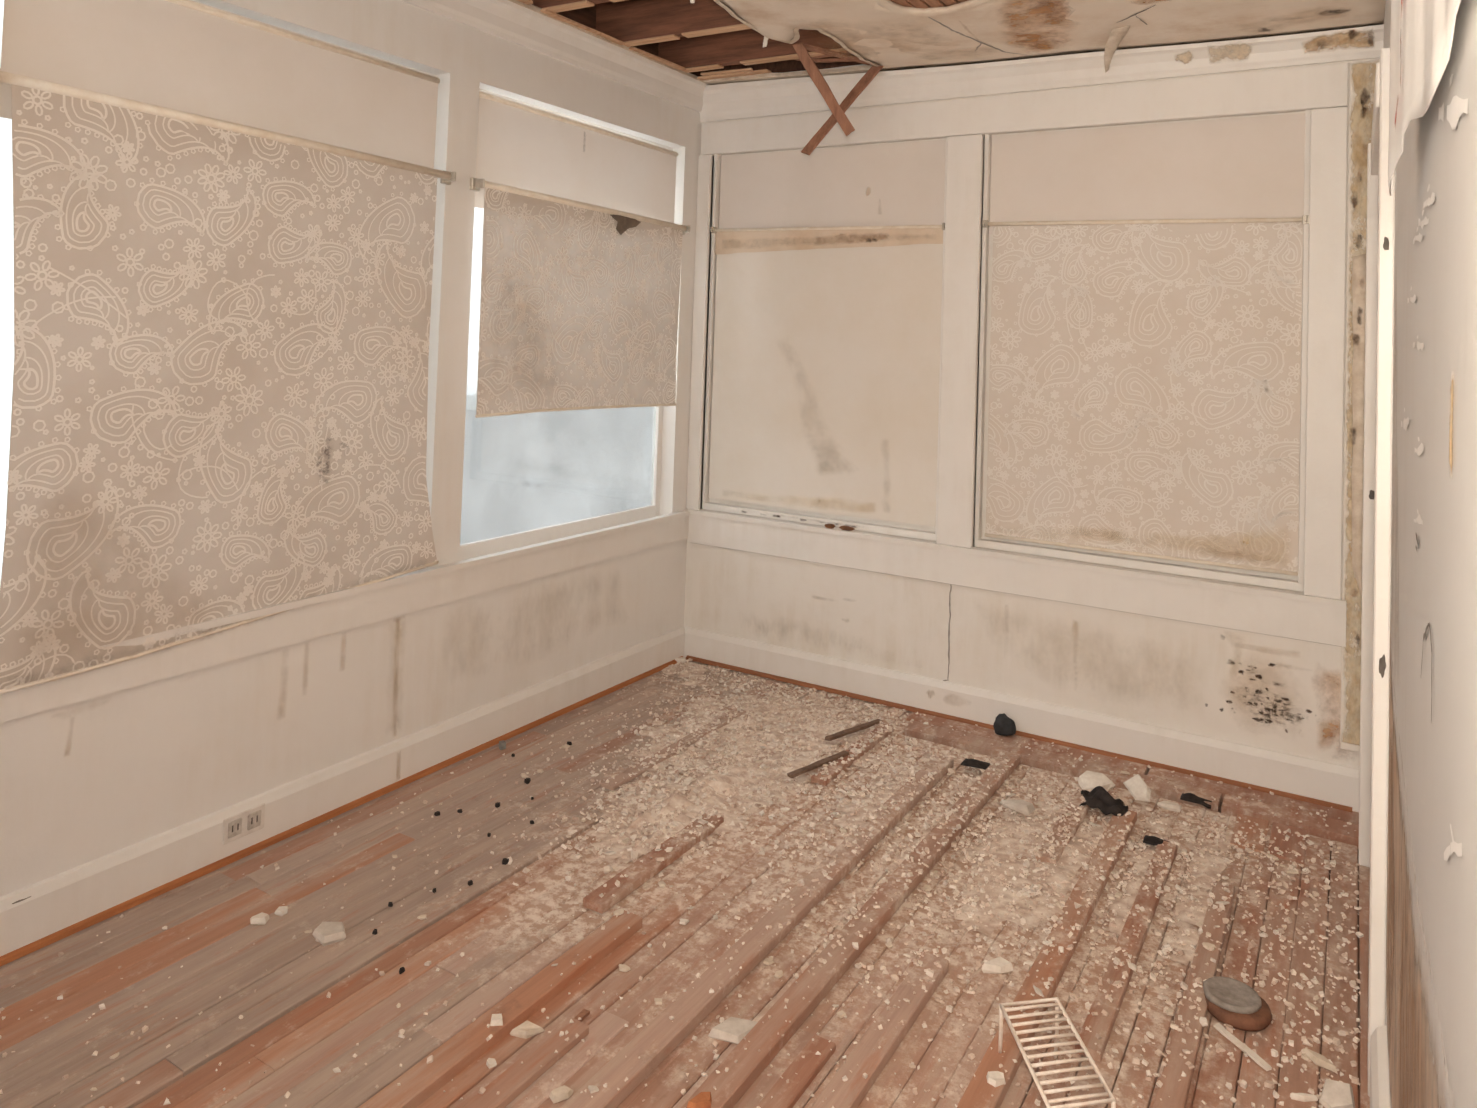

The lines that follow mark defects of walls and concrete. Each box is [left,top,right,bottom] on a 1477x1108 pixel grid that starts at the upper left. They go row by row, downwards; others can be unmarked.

spalling [509,0,884,83]
leakage [1008,1,1062,49]
peeling [1176,51,1192,63]
peeling [1210,44,1250,62]
peeling [1438,74,1468,130]
peeling [1343,63,1376,745]
leakage [1206,661,1312,732]
crack [1421,622,1432,722]
peeling [1444,824,1462,861]